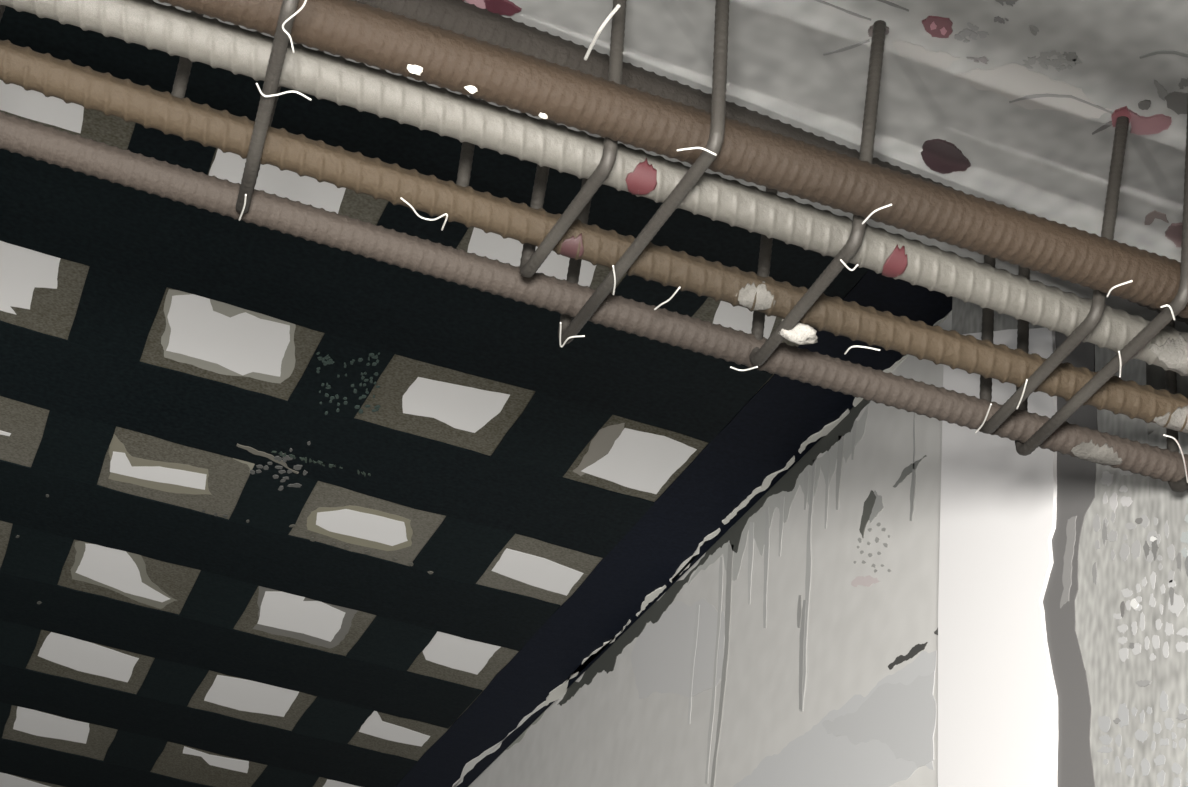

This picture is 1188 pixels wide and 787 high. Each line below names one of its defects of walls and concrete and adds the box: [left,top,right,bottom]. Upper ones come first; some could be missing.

spalling [1138,80,1188,115]
leakage [893,455,927,521]
leakage [851,490,891,587]
leakage [506,399,871,787]
leakage [733,651,937,787]